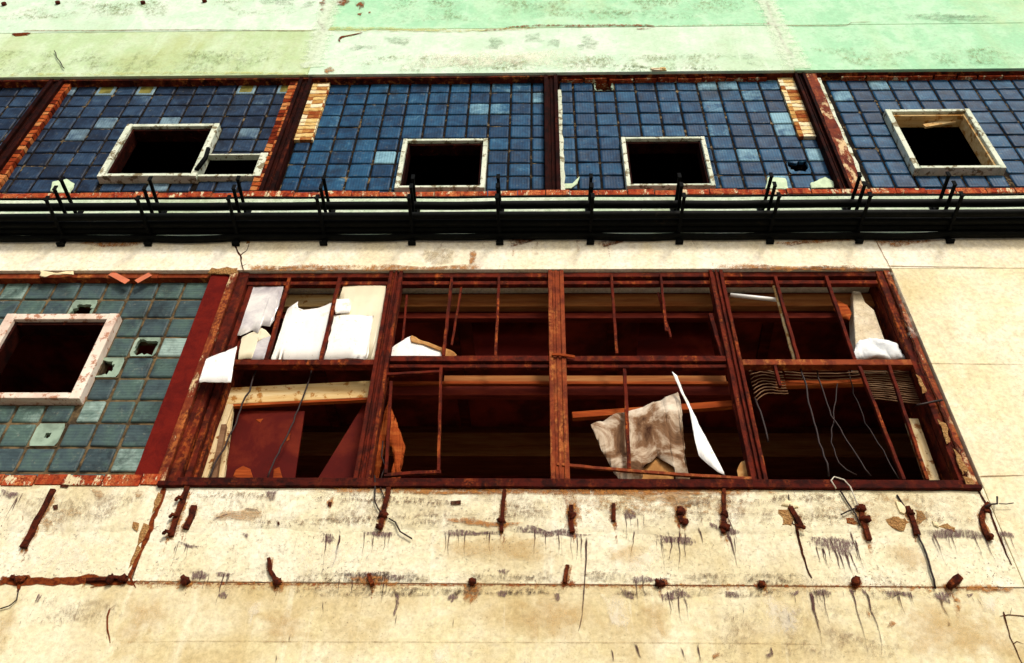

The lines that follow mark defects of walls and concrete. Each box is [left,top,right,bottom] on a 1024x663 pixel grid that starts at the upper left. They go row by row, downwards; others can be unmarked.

water stain [191,570,233,599]
water stain [323,498,395,564]
water stain [338,572,416,623]
water stain [444,529,501,549]
rust [327,488,750,545]
water stain [504,506,590,555]
water stain [588,493,752,614]
water stain [778,588,882,651]
water stain [812,497,890,570]
water stain [906,498,1015,560]